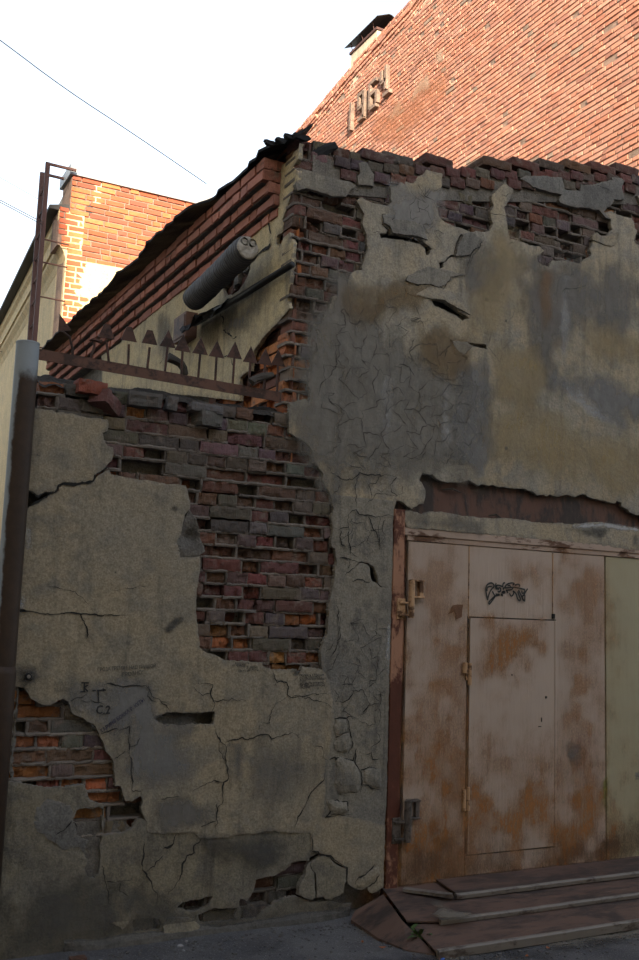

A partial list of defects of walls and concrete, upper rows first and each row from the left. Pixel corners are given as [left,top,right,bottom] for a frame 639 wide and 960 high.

spalling [436,186,491,237]
spalling [504,192,639,266]
spalling [35,140,429,671]
crack [320,185,482,583]
water stain [521,257,639,424]
crack [29,467,109,506]
spalling [9,690,143,838]
crack [71,683,170,711]
crack [101,600,386,904]
spalling [178,855,317,922]